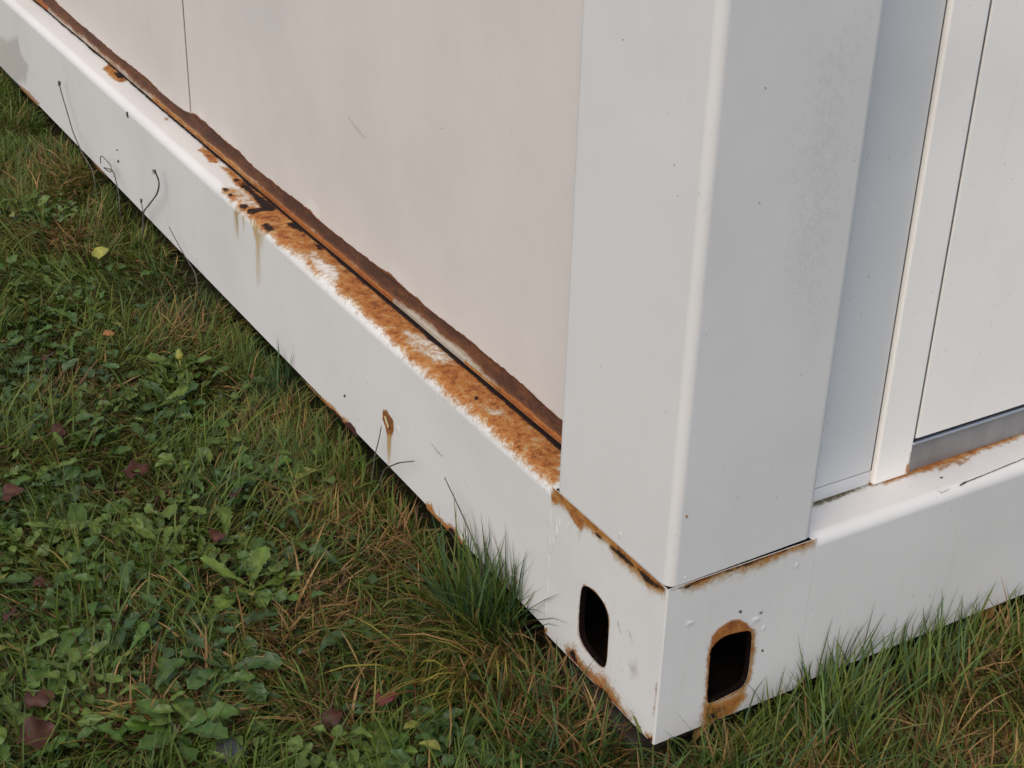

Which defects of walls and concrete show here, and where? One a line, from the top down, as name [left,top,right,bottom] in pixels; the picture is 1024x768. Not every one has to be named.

rust [33,0,665,593]
rust [868,433,1024,486]
rust [683,540,814,589]
rust [701,620,755,725]